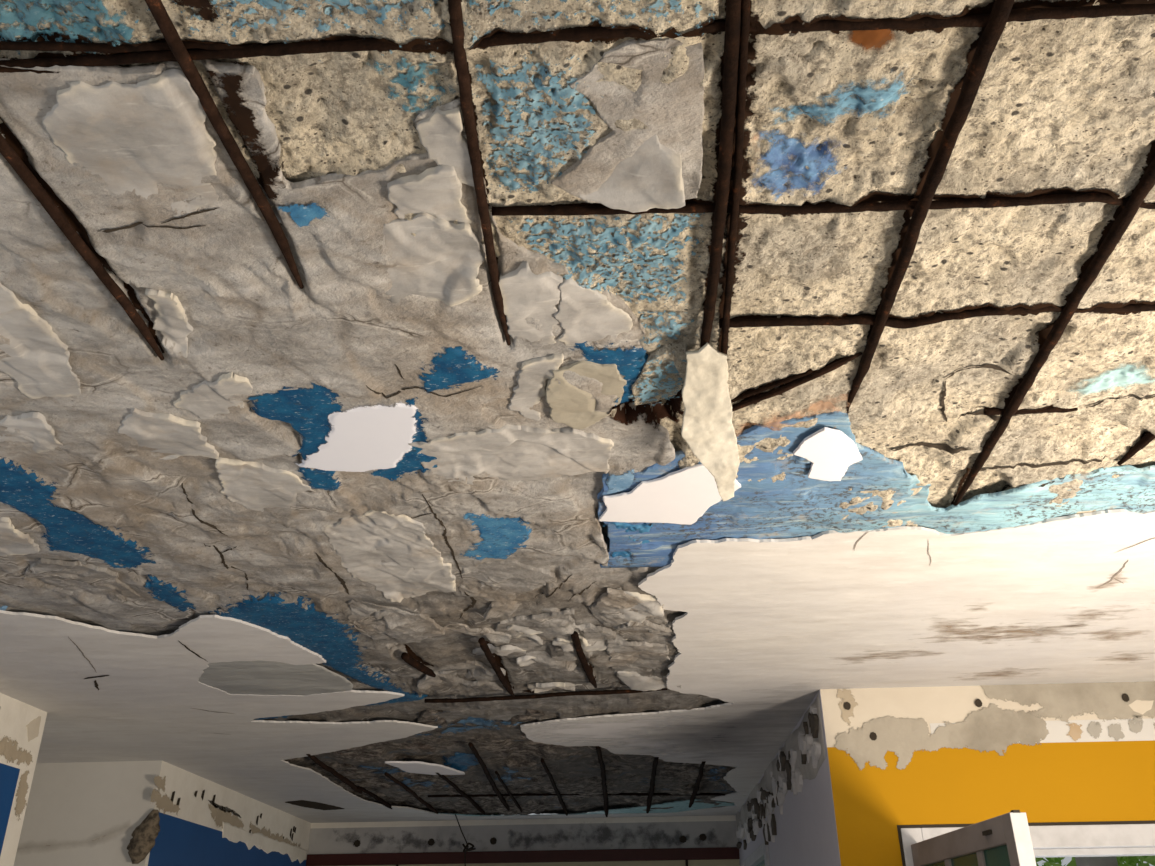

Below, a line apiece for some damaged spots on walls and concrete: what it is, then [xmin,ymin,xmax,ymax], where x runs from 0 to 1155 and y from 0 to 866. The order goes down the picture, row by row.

corrosion [172,0,218,28]
corrosion [206,62,291,206]
corrosion [719,14,763,294]
peeling [0,457,156,569]
crack [181,483,248,590]
peeling [371,446,437,481]
crack [411,494,476,619]
corrosion [609,387,684,429]
crack [889,364,1109,493]
leakage [942,614,1102,638]
spalling [285,709,737,817]
peeling [834,681,1155,770]